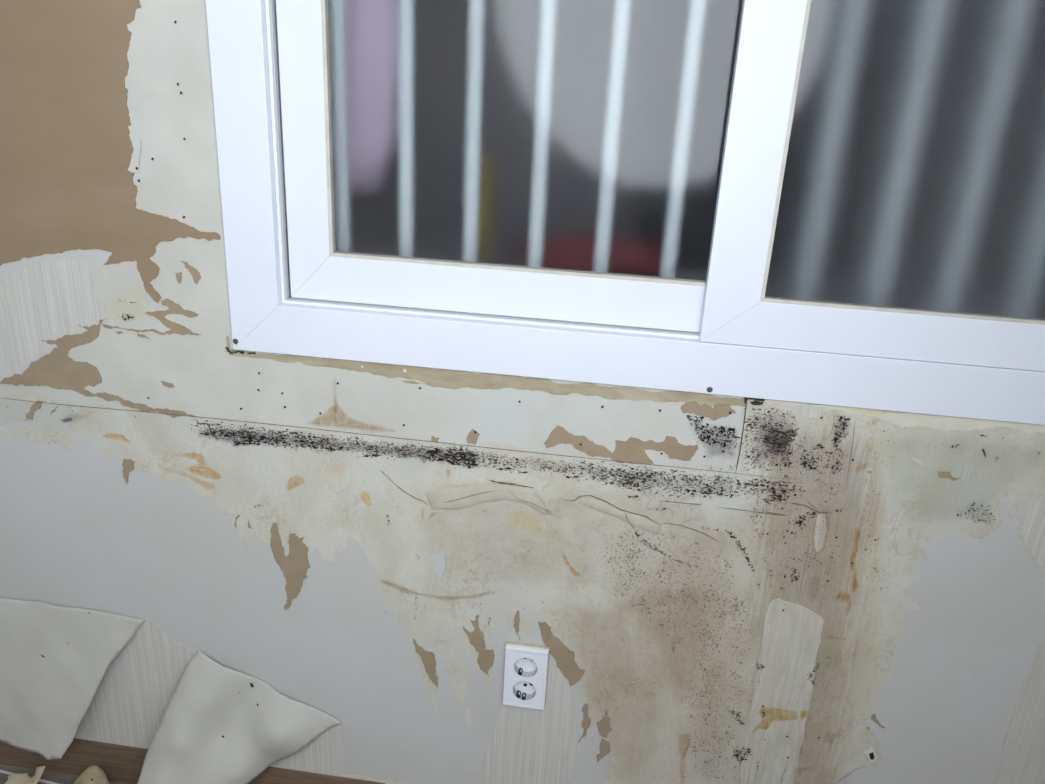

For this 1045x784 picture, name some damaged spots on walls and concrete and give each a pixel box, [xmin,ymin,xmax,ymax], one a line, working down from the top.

flaking render [39,0,744,472]
water stain [191,408,850,782]
peeling [0,384,1045,784]